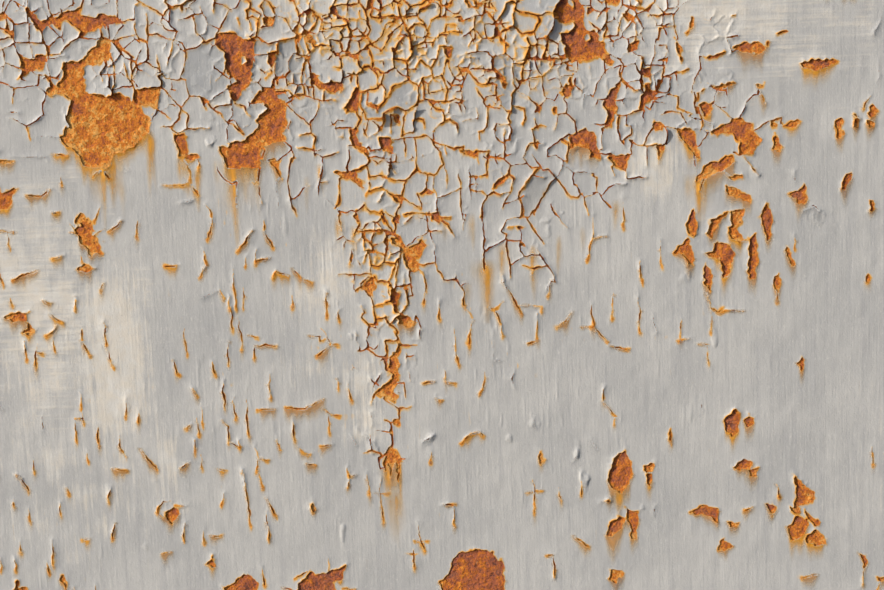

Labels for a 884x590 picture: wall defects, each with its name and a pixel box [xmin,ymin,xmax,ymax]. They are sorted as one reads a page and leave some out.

crack [0,227,67,310]
crack [22,282,117,373]
rust [24,6,160,277]
crack [71,158,393,590]
rust [214,26,290,212]
peeling [0,0,714,504]
rust [533,0,618,117]
crack [419,237,748,405]
peeling [709,85,760,119]
rust [670,78,806,296]
crack [0,457,74,577]
rust [436,545,509,590]